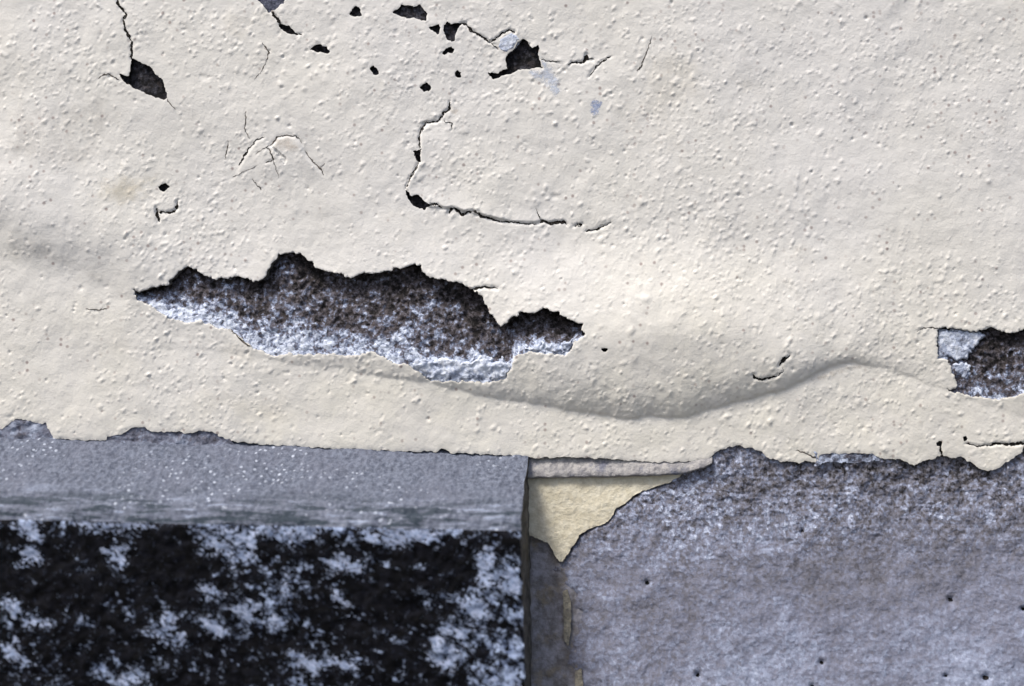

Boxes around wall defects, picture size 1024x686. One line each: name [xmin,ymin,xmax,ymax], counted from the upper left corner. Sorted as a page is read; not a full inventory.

crack [98,0,133,80]
spalling [258,0,285,13]
peeling [310,44,330,54]
spalling [393,4,461,55]
spalling [488,33,543,79]
crack [406,102,453,187]
crack [155,201,178,222]
crack [431,203,611,232]
spalling [133,252,585,383]
crack [753,355,790,381]
spalling [937,327,1024,400]
spalling [528,441,1024,686]